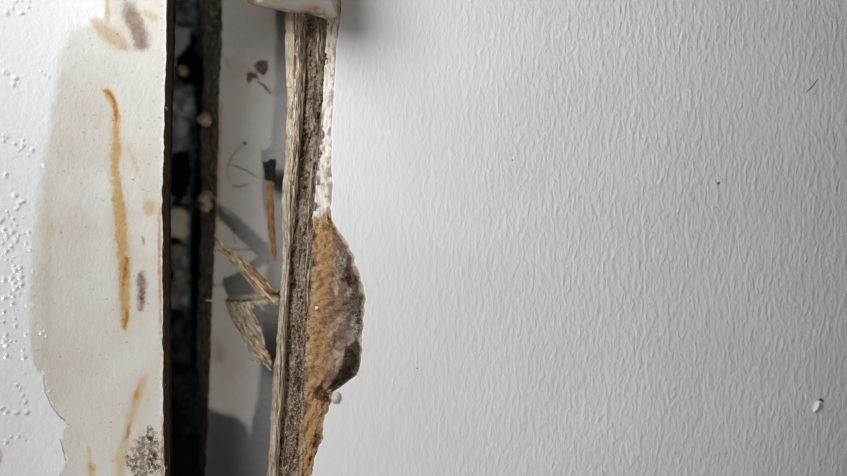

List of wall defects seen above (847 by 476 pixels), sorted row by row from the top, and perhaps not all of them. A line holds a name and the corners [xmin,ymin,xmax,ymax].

peeling [26,0,166,476]
spalling [196,0,223,476]
peeling [247,60,270,93]
spalling [263,7,341,476]